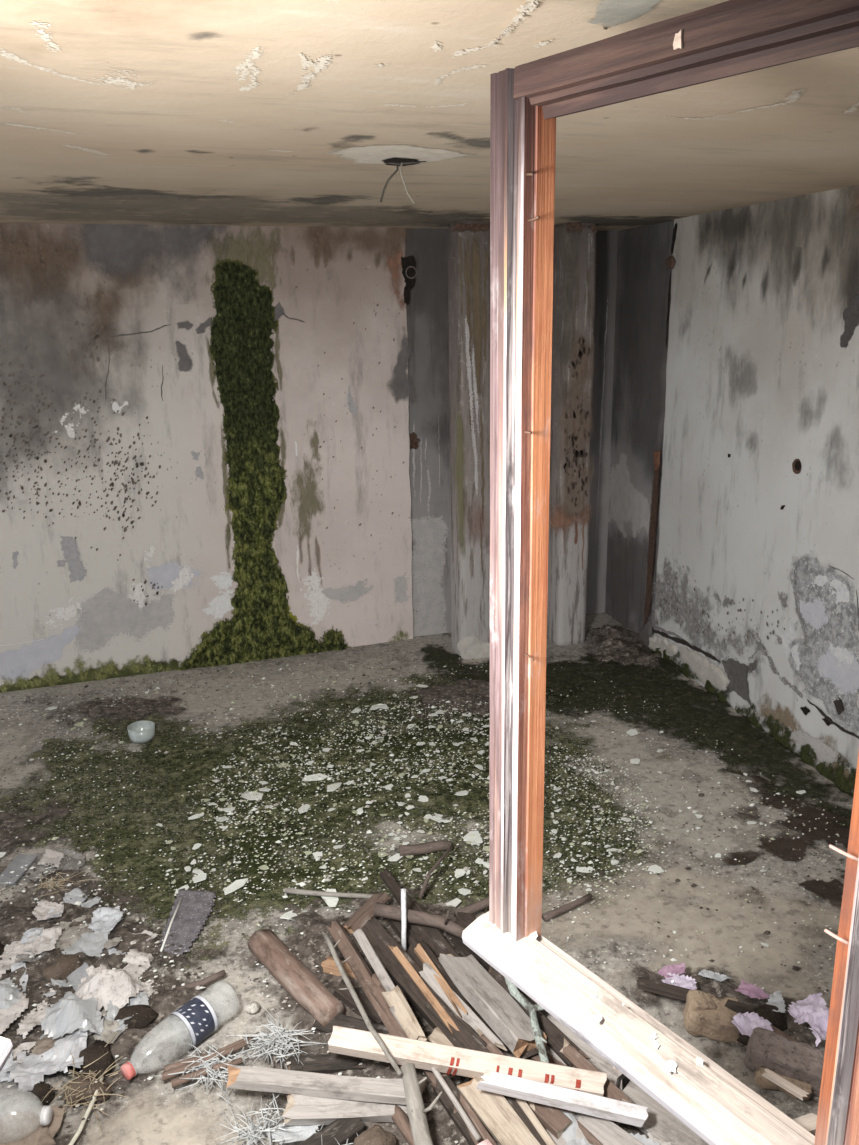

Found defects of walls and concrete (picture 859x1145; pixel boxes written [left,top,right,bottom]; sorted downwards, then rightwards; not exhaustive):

peeling [587,0,660,30]
water stain [42,178,234,199]
water stain [294,195,370,205]
peeling [840,295,859,347]
water stain [0,224,225,539]
peeling [57,534,87,582]
peeling [0,561,206,681]
crack [652,627,721,662]
flaking render [781,555,859,730]
crack [750,634,859,739]